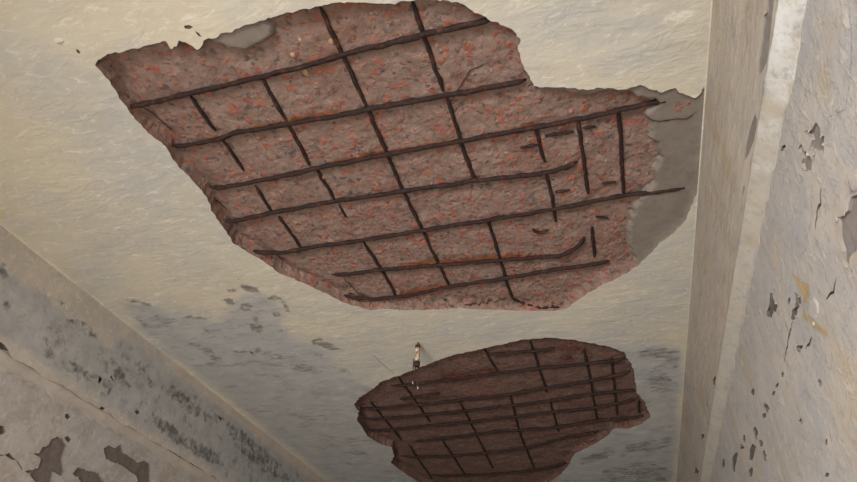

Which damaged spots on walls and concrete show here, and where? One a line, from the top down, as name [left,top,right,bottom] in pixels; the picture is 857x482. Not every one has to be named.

spalling [95,0,705,311]
peeling [798,123,824,172]
peeling [836,194,857,268]
crack [784,321,812,361]
water stain [0,257,418,482]
spalling [354,338,650,482]
peeling [25,436,104,482]
peeling [104,444,151,482]
peeling [722,427,767,477]